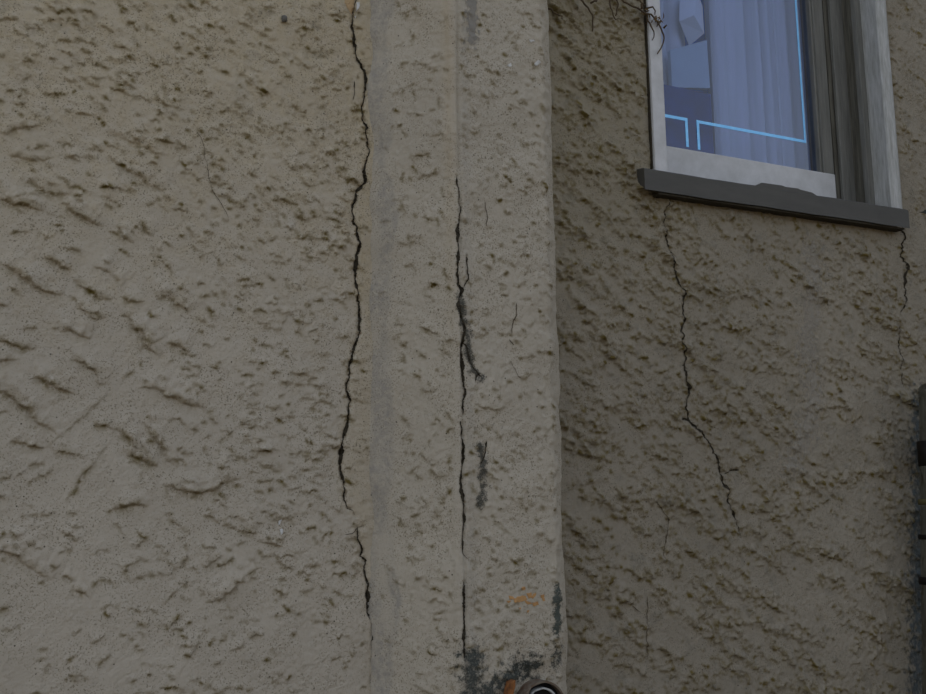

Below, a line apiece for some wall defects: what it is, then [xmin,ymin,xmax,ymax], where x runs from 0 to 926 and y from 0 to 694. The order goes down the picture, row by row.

crack [338,1,373,647]
crack [455,177,487,559]
crack [663,203,741,536]
crack [460,581,468,659]